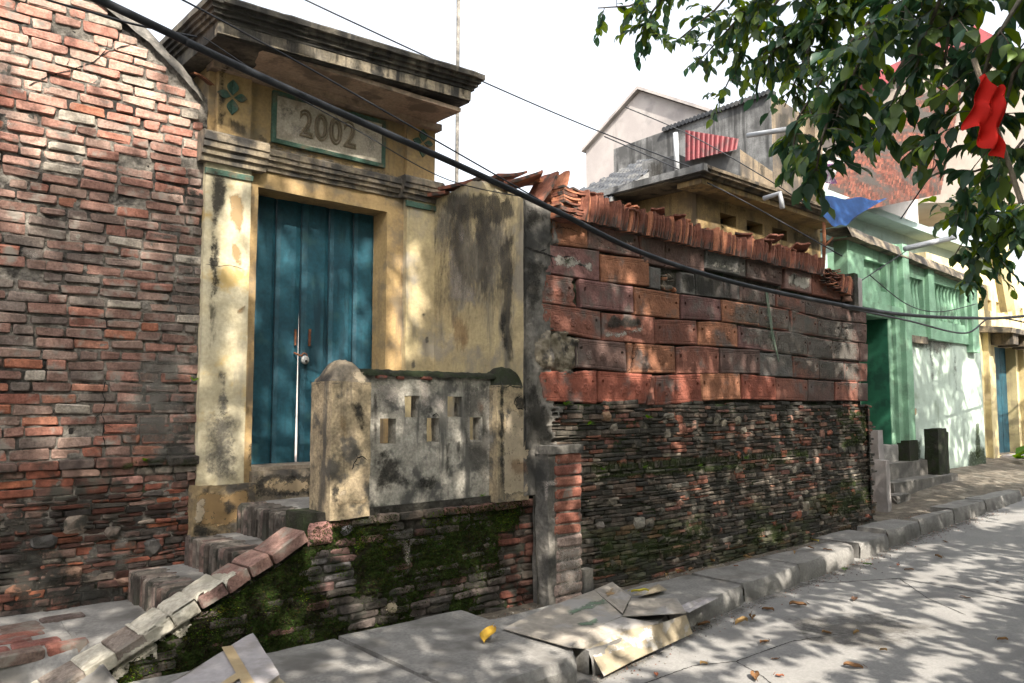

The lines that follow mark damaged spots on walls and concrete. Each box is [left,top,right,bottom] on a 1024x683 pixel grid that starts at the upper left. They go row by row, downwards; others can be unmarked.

damp [210,173,226,294]
peeling [230,194,243,231]
damp [440,193,513,359]
damp [353,393,377,431]
damp [446,386,504,480]
damp [377,452,435,489]
spalling [193,490,248,536]